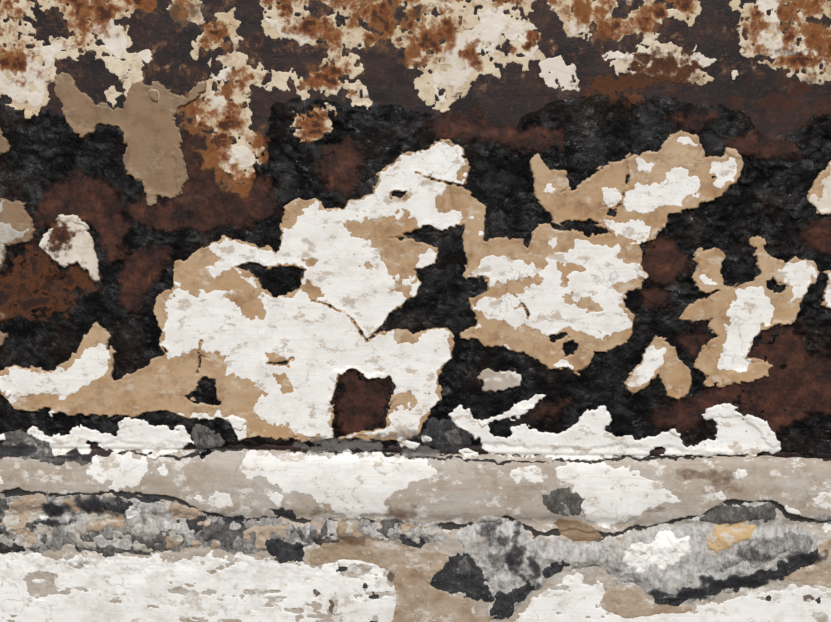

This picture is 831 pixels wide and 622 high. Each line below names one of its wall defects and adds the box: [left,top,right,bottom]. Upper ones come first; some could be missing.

peeling [0,0,386,207]
corrosion [262,0,482,90]
peeling [387,0,581,113]
corrosion [743,0,831,79]
corrosion [0,68,281,321]
peeling [624,235,831,399]
peeling [0,128,781,622]
corrosion [653,326,831,433]
crack [0,487,311,524]
crack [437,522,474,531]
crack [502,515,561,539]
crack [596,499,823,542]